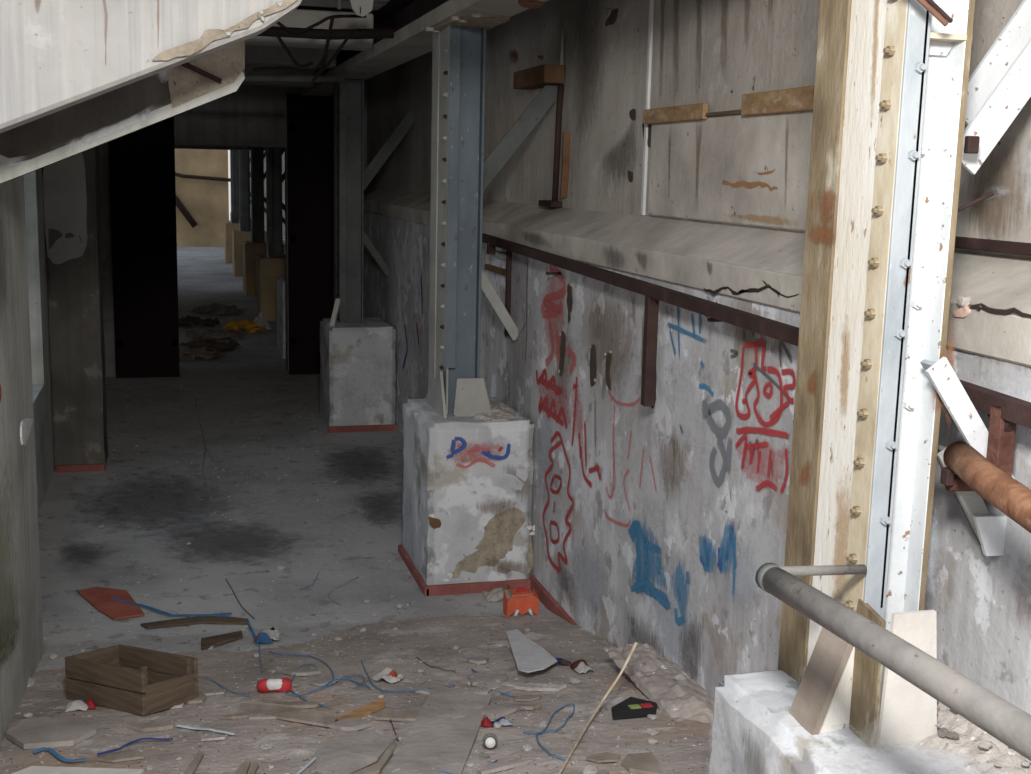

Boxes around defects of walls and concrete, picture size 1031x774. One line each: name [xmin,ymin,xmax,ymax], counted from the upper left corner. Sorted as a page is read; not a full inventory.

spalling [152,0,297,77]
peeling [71,114,146,146]
peeling [0,155,20,166]
corrosion [812,189,834,243]
crack [704,281,798,298]
crack [969,303,1031,318]
peeling [442,508,535,583]